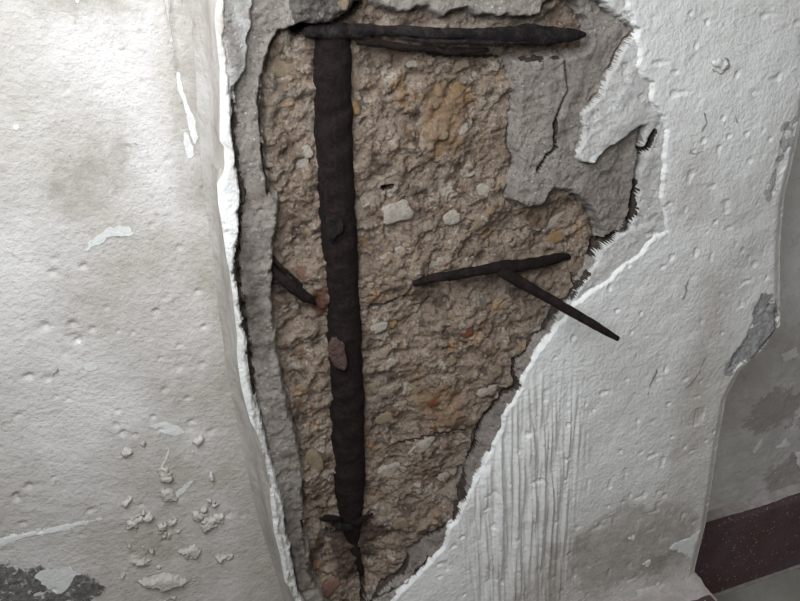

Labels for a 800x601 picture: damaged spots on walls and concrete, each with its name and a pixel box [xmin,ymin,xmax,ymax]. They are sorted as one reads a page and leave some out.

corrosion [356,40,489,55]
corrosion [272,254,303,287]
spalling [223,0,666,601]
corrosion [328,337,348,371]
corrosion [305,513,396,582]
water stain [0,564,107,601]